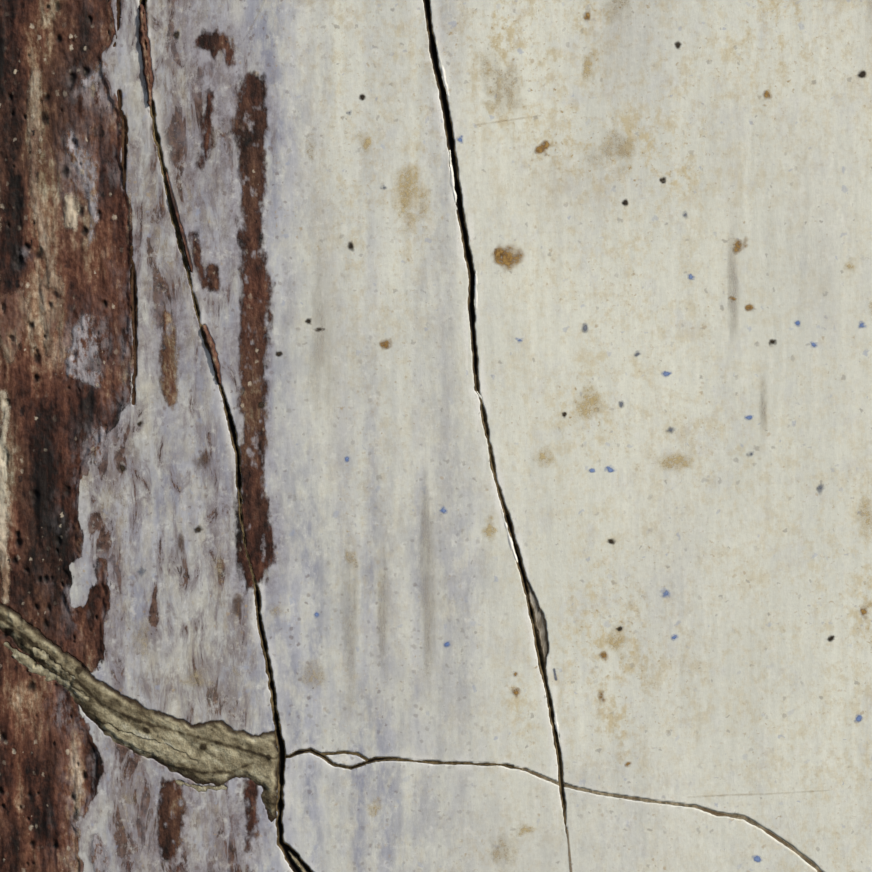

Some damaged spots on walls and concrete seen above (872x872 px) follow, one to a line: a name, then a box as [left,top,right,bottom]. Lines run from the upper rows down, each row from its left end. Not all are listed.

peeling [196,29,234,66]
peeling [196,90,215,169]
peeling [189,232,220,291]
peeling [0,0,134,673]
peeling [159,311,180,406]
peeling [231,72,276,591]
crack [138,0,822,872]
peeling [0,629,109,872]
peeling [103,723,198,765]
peeling [157,778,227,872]
peeling [243,779,259,851]